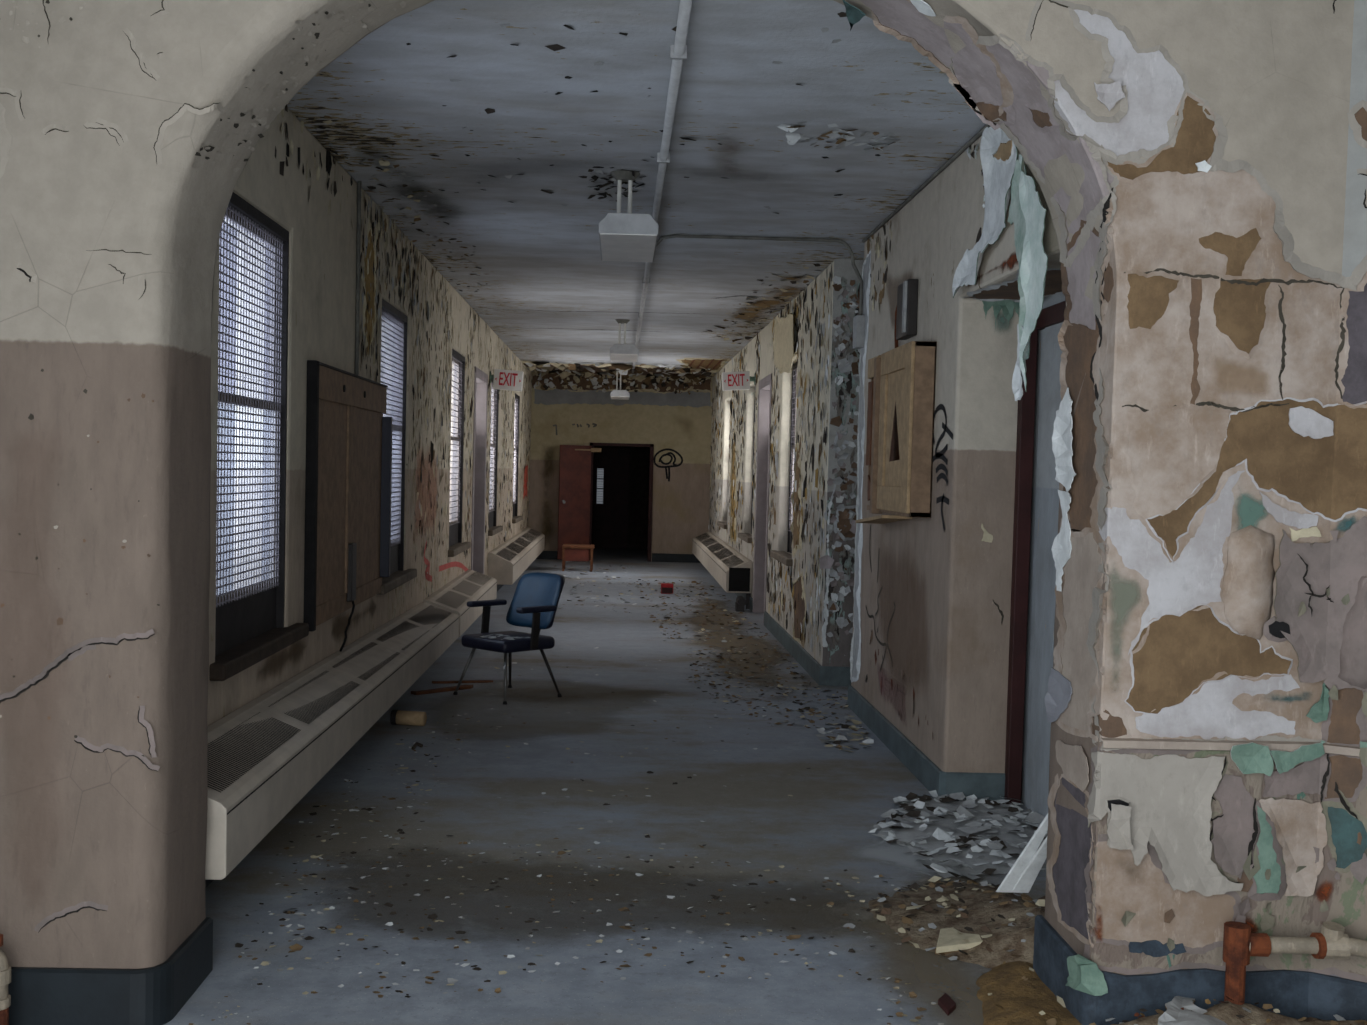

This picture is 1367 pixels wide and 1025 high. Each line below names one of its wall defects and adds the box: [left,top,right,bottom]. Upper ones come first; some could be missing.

crack [42,0,51,41]
crack [124,0,170,80]
crack [0,87,223,164]
spalling [192,0,933,739]
crack [0,629,154,703]
crack [74,706,160,772]
crack [34,901,108,933]
corrosion [0,1007,9,1025]